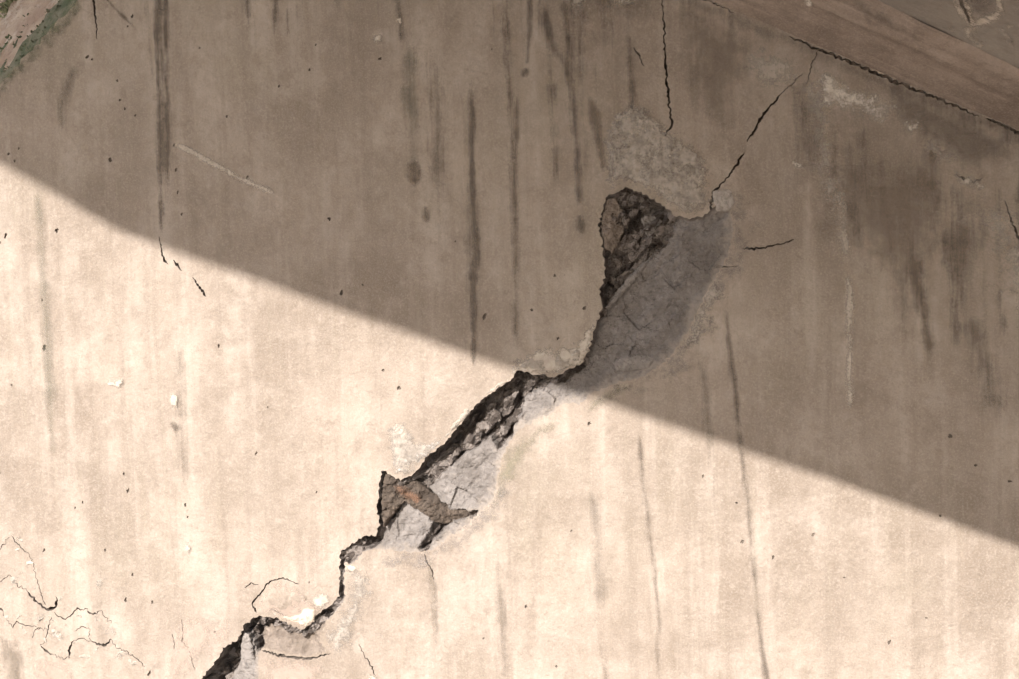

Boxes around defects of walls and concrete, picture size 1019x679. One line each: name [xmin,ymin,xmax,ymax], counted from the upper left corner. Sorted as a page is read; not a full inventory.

leakage [154,0,167,47]
crack [634,0,674,135]
peeling [952,0,1004,49]
leakage [158,79,169,172]
leakage [805,74,897,254]
crack [159,237,206,297]
leakage [469,106,479,361]
spalling [487,327,594,394]
crack [202,36,1019,679]
spalling [388,406,471,473]
crack [0,536,145,667]
peeling [245,577,329,627]